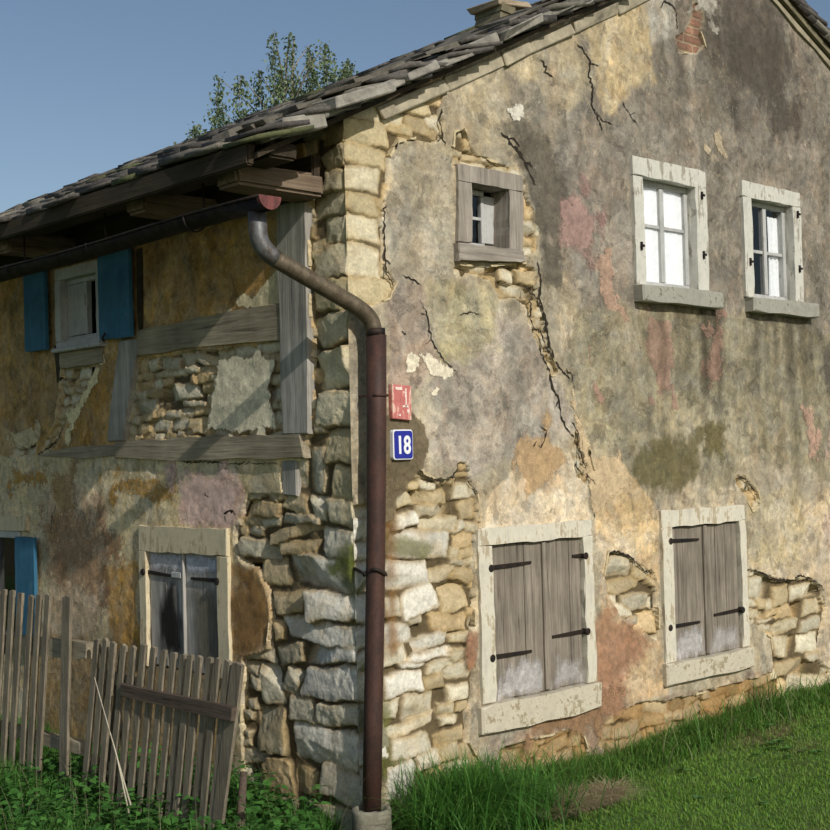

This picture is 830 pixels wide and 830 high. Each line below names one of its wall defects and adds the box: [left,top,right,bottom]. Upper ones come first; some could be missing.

crack [501,132,535,185]
crack [578,45,611,129]
flaking render [5,354,105,546]
crack [382,206,458,373]
flaking render [406,352,453,379]
flaking render [453,185,559,377]
crack [525,262,595,484]
water stain [705,420,725,457]
flaking render [108,292,367,830]
flaking render [381,463,481,830]
flaking render [603,550,660,640]
flaking render [498,570,830,774]